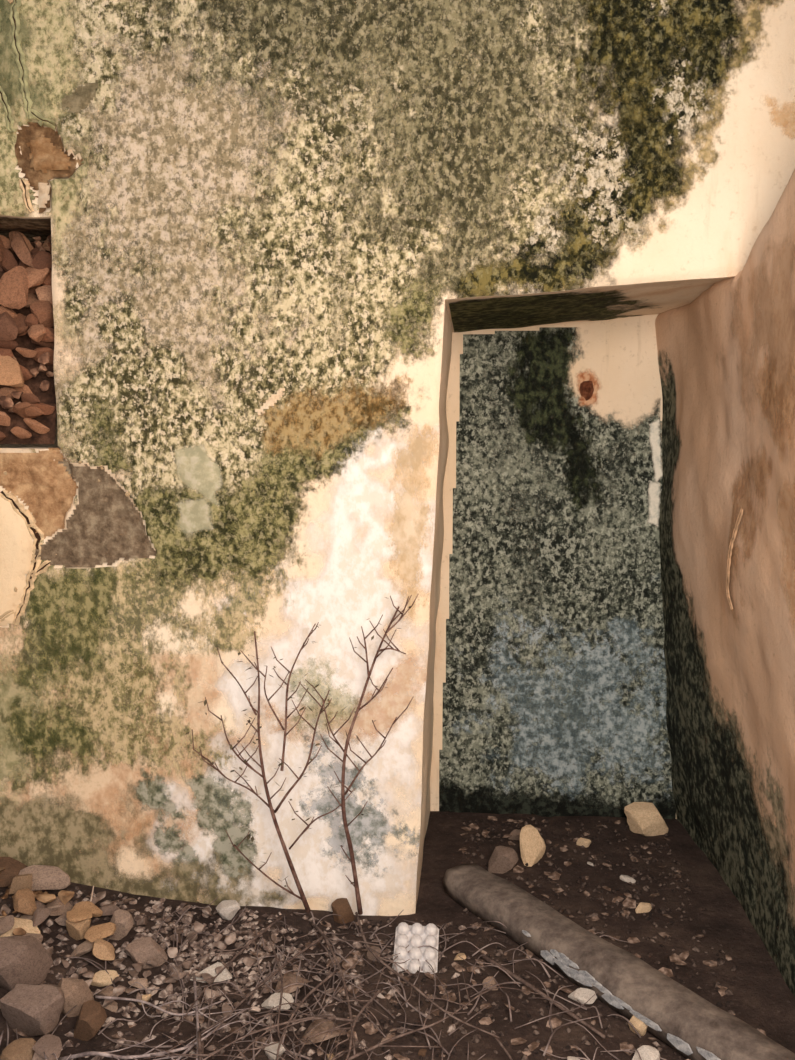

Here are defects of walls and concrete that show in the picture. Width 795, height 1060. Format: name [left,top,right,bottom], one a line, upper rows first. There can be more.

flaking render [15,120,84,213]
damp [0,217,51,242]
crack [0,489,57,625]
flaking render [0,448,157,568]
damp [439,327,795,997]